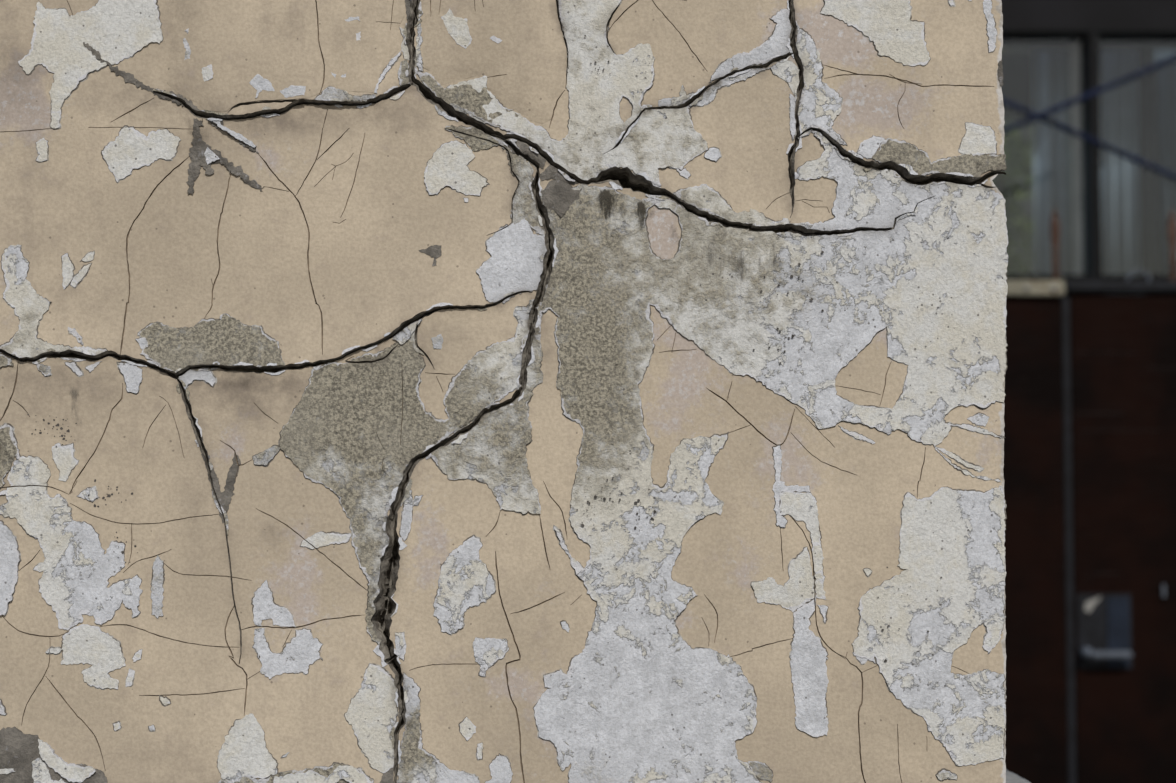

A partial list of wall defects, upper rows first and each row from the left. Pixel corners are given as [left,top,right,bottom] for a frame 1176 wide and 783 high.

peeling [18,0,264,195]
crack [604,0,1006,218]
peeling [0,244,108,377]
peeling [116,313,285,395]
crack [0,0,934,783]
peeling [197,0,1009,783]
peeling [0,423,165,690]
peeling [0,699,108,783]